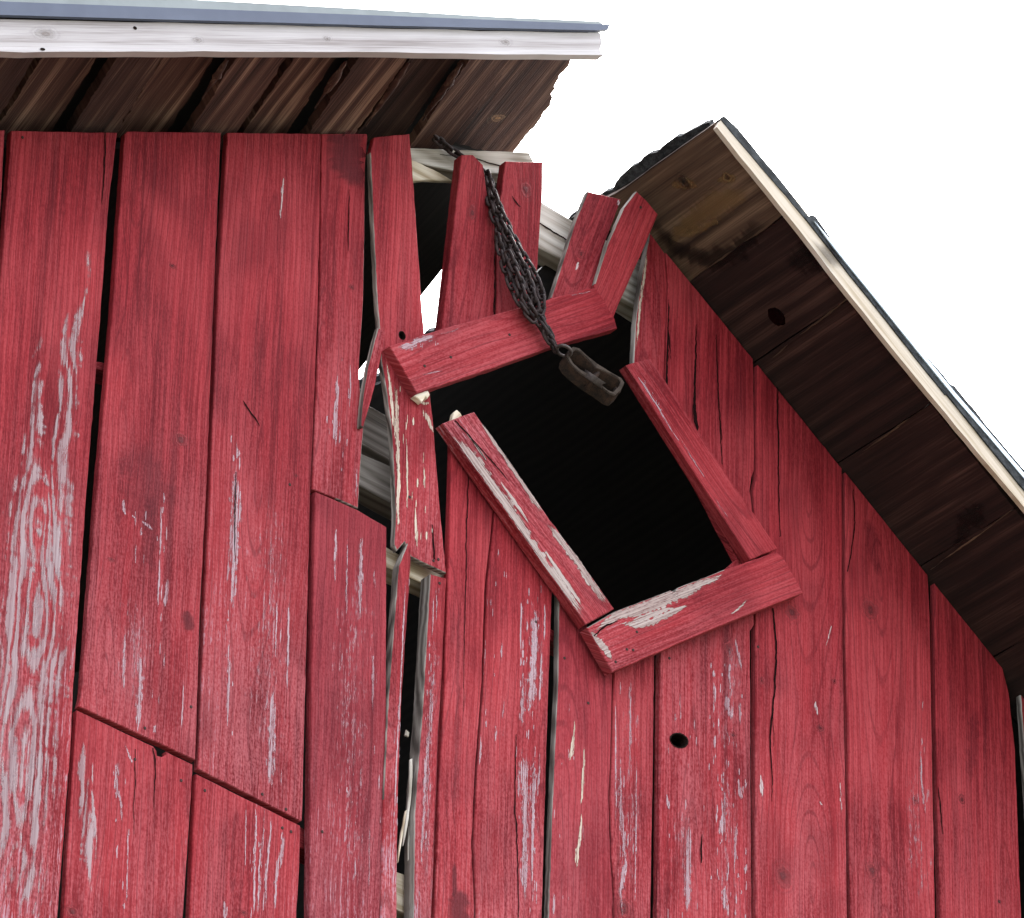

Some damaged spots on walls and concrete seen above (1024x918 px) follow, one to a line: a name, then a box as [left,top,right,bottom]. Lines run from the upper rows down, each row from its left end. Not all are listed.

peeling [0,298,85,904]
peeling [78,746,96,877]
peeling [226,435,242,629]
peeling [387,366,434,545]
peeling [454,425,580,612]
peeling [516,589,546,904]
peeling [551,527,605,601]
peeling [592,575,721,659]
crack [666,299,722,456]
peeling [709,639,747,918]
crack [769,608,777,793]
crack [847,489,855,572]